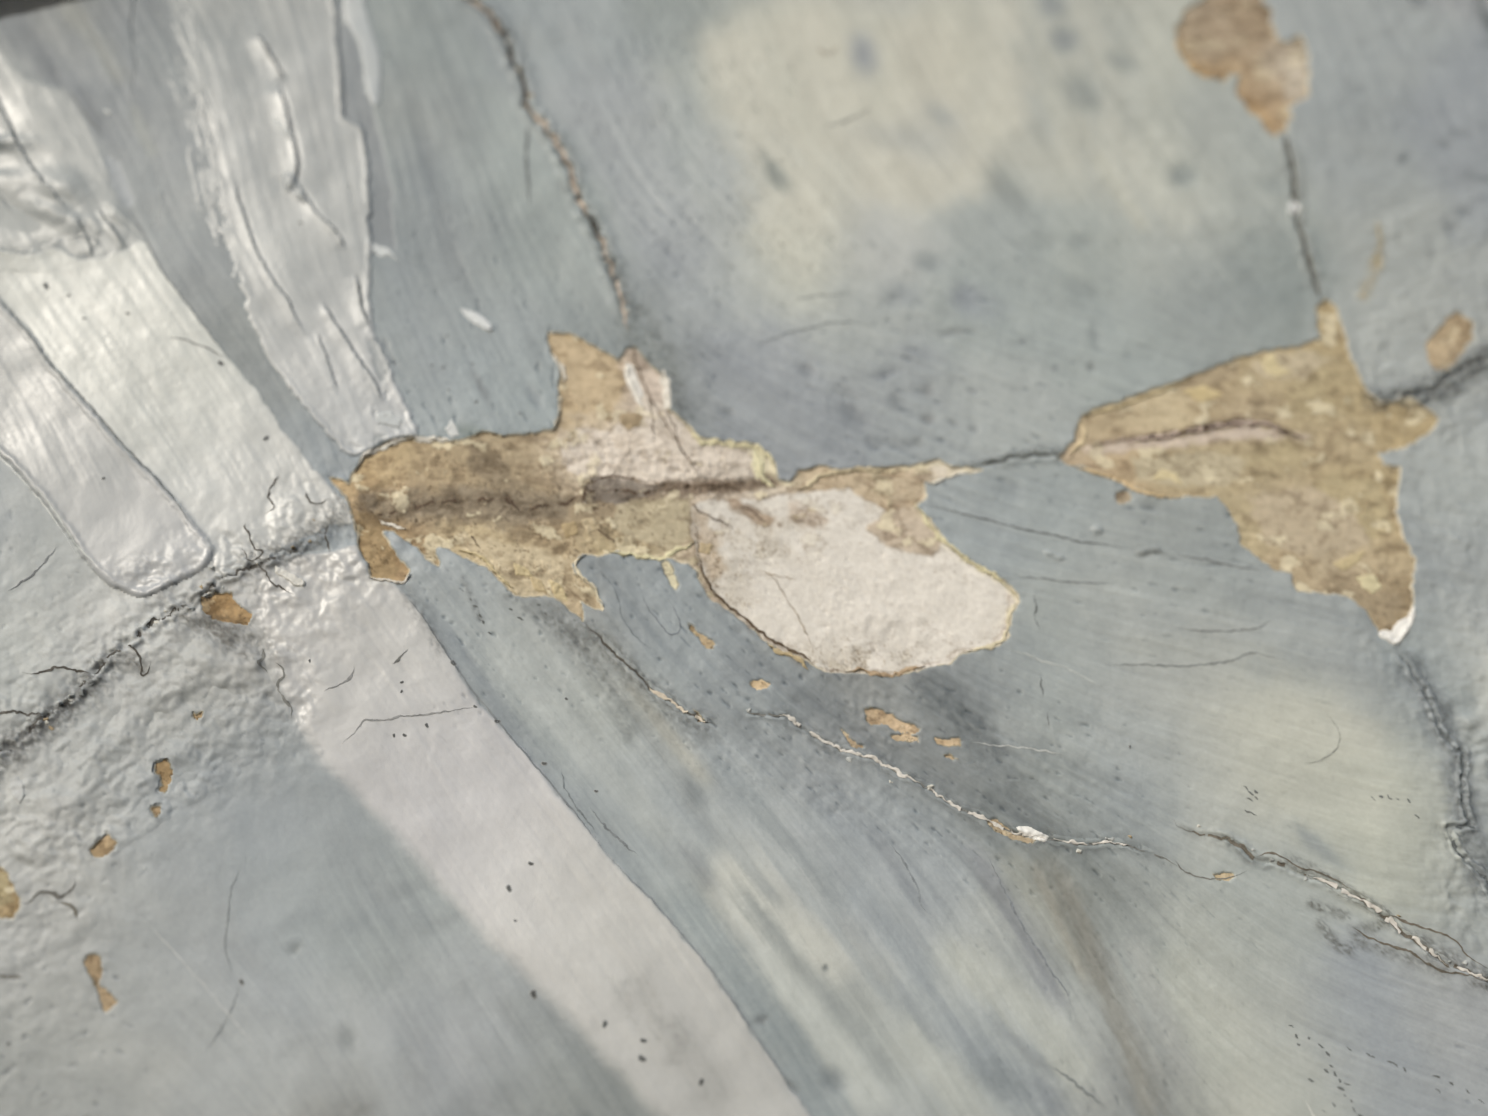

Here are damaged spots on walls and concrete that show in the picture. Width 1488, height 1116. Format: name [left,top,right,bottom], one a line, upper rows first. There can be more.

peeling [1175,0,1311,137]
crack [1283,132,1322,300]
crack [0,0,815,751]
peeling [1426,311,1475,371]
peeling [329,332,1020,677]
crack [930,506,1124,548]
peeling [1058,299,1438,645]
peeling [201,592,252,625]
crack [561,769,638,855]
peeling [865,707,961,760]
crack [584,529,1488,1006]
peeling [0,867,20,919]